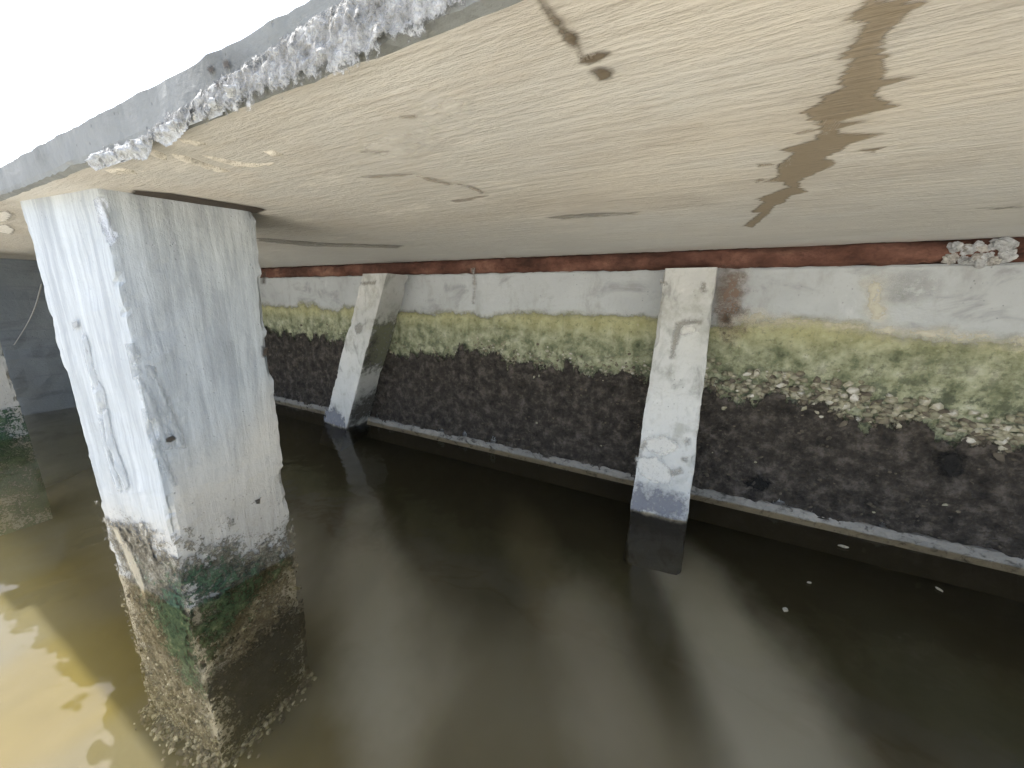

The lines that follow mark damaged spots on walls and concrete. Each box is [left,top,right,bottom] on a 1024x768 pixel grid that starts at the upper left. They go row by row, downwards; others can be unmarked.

spalling [84,0,465,175]
damp [745,0,927,227]
rust [714,270,746,341]
damp [324,408,345,429]
damp [631,482,687,521]